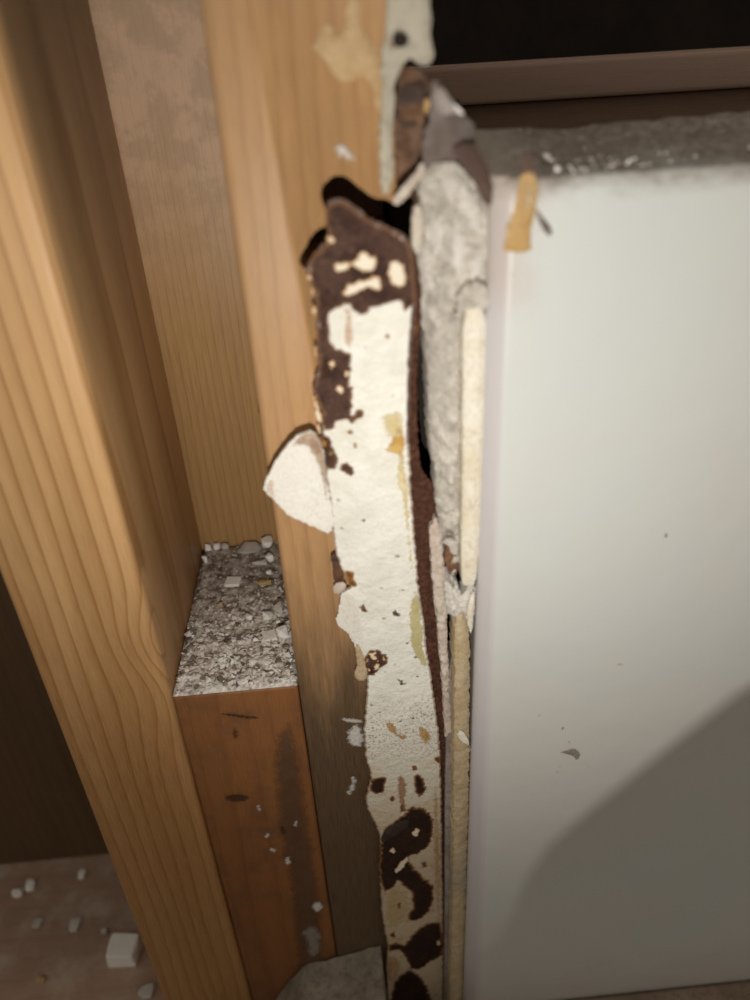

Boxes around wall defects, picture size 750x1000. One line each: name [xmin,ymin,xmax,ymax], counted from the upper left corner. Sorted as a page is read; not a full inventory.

spalling [409,159,490,575]
flaking render [264,429,343,533]
peeling [331,553,370,656]